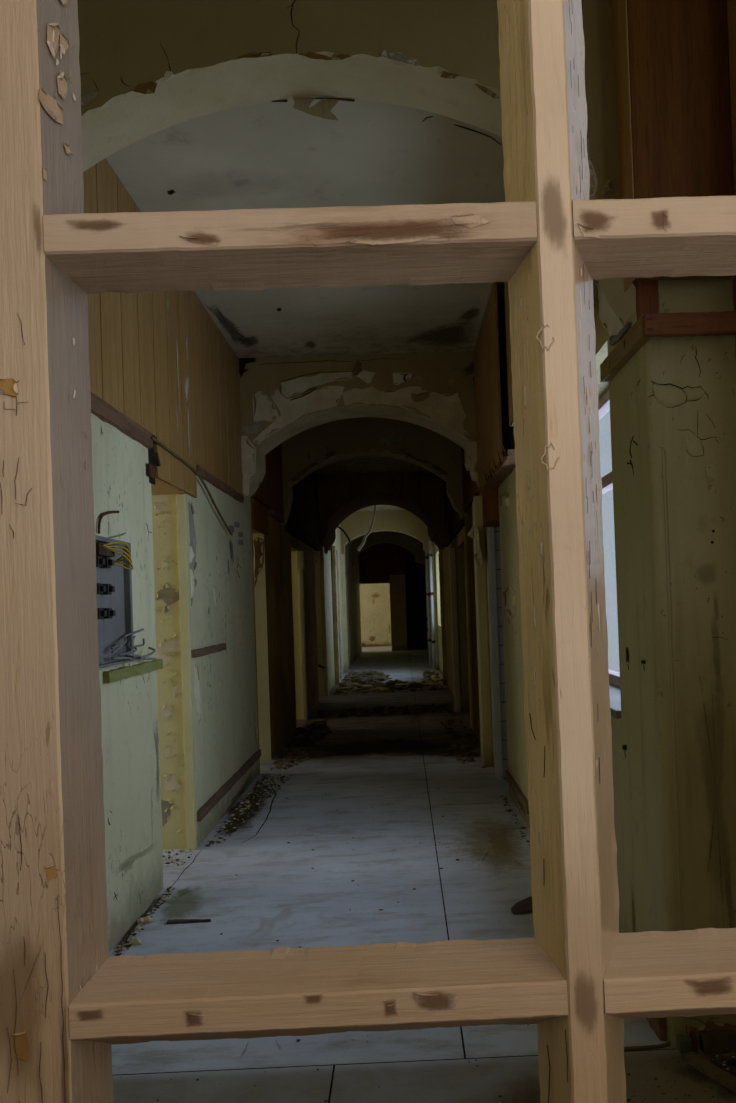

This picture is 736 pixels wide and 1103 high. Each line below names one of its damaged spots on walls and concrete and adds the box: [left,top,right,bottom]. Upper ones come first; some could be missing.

peeling [39,22,98,125]
spalling [130,71,174,94]
crack [287,0,300,54]
peeling [298,52,352,60]
spalling [241,360,477,497]
crack [631,346,719,457]
peeling [153,501,197,623]
spalling [161,732,185,826]